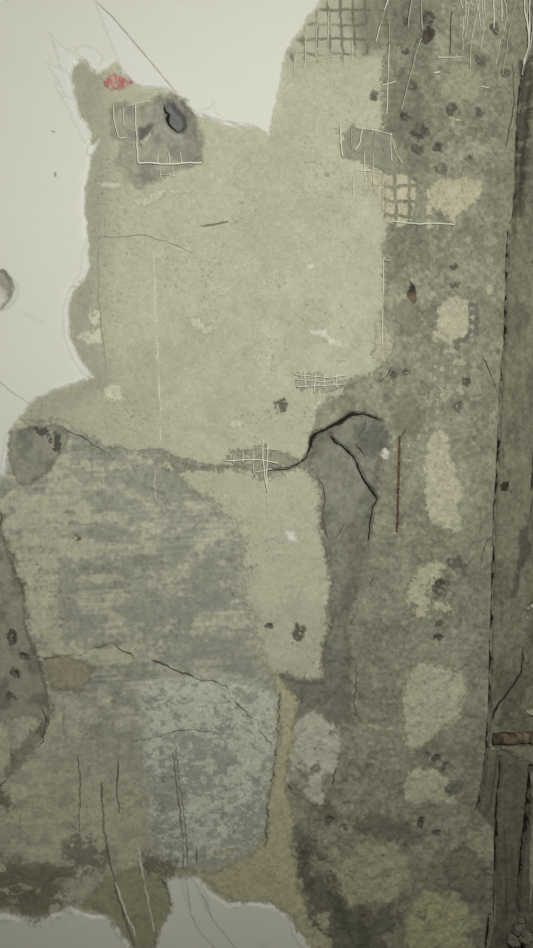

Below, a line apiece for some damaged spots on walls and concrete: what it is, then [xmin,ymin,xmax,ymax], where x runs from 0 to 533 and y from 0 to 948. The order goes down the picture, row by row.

peeling [0,0,408,948]
crack [268,413,379,542]
crack [475,56,533,948]
crack [40,708,49,744]
crack [115,644,249,716]
crack [265,693,292,790]
rust [492,731,533,745]
damp [313,801,416,847]
damp [297,833,398,948]